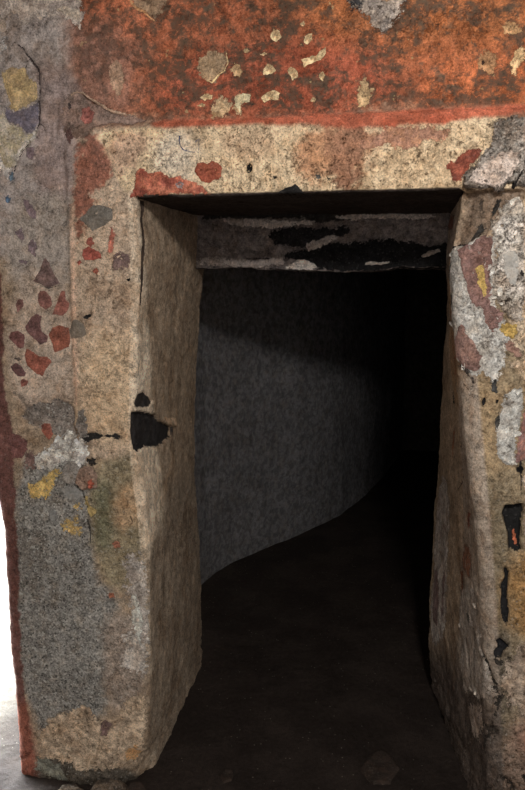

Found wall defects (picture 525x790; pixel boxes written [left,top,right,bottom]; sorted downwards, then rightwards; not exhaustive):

flaking render [346,0,407,37]
crack [14,42,45,172]
peeling [223,217,315,229]
peeling [335,213,436,221]
peeling [200,235,338,271]
spalling [130,392,177,452]